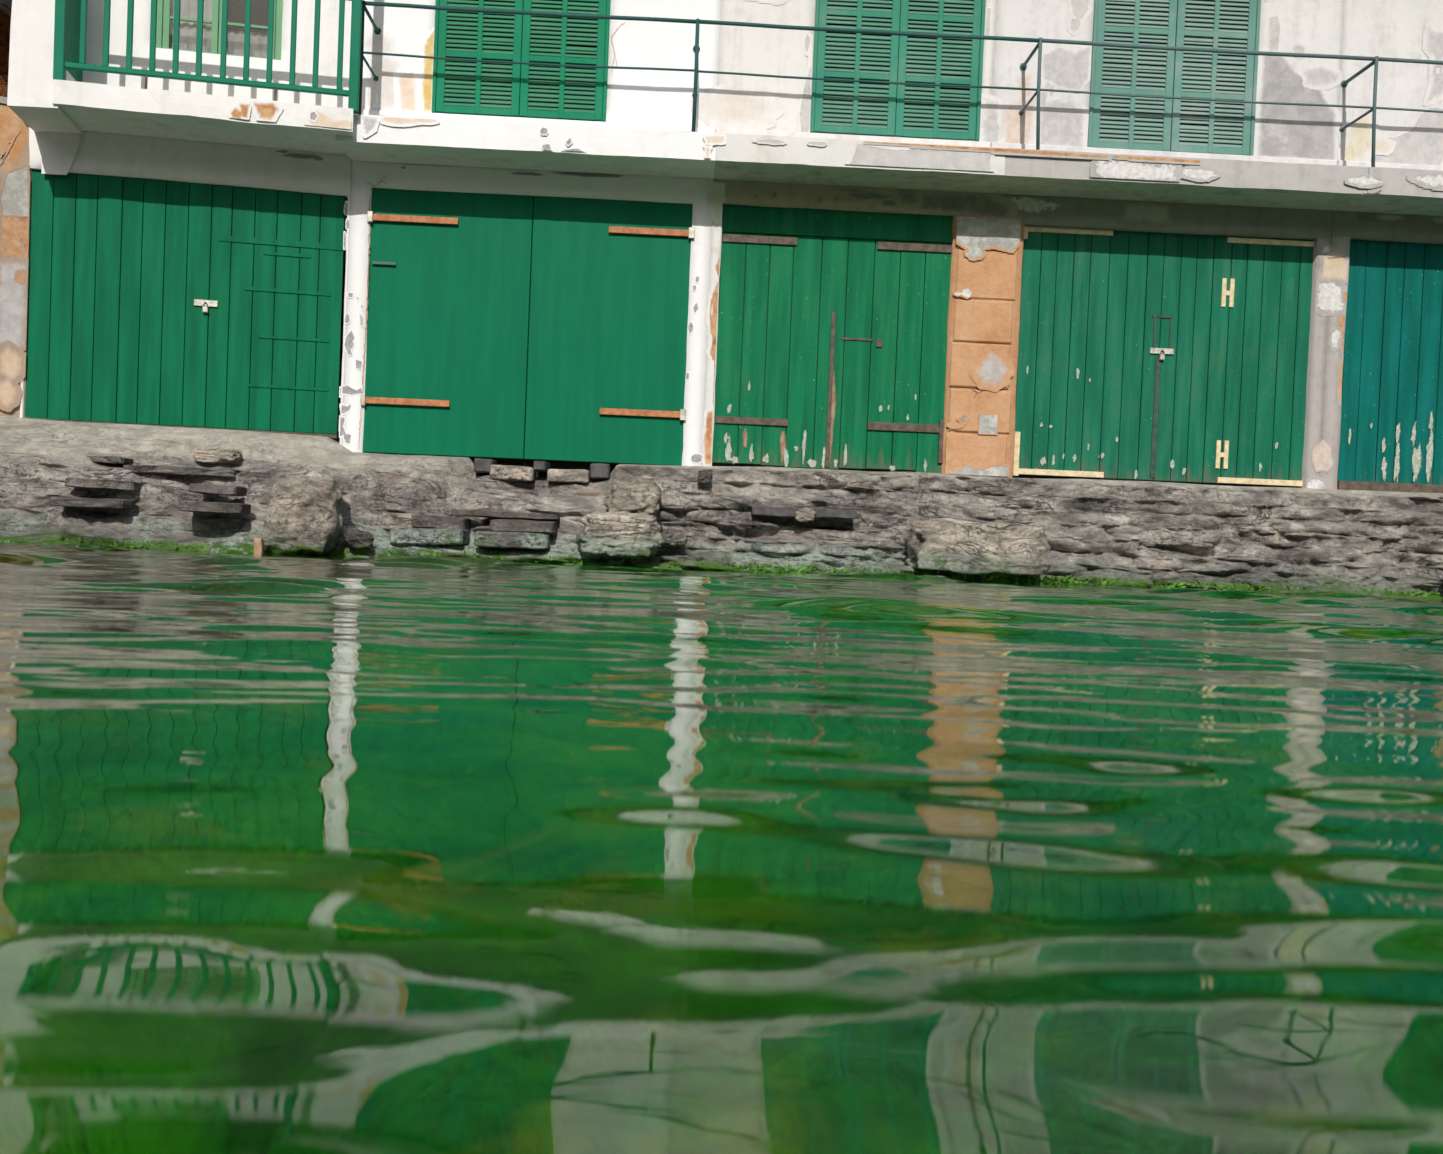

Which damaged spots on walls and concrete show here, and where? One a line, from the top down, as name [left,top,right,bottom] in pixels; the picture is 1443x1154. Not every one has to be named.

peeling [845,0,1221,182]
peeling [1253,0,1343,160]
peeling [1345,21,1443,191]
peeling [0,215,29,351]
peeling [339,292,365,445]
peeling [688,226,732,414]
peeling [724,372,847,469]
flaking render [1306,428,1351,489]
peeling [1315,279,1347,405]
peeling [1370,412,1434,482]